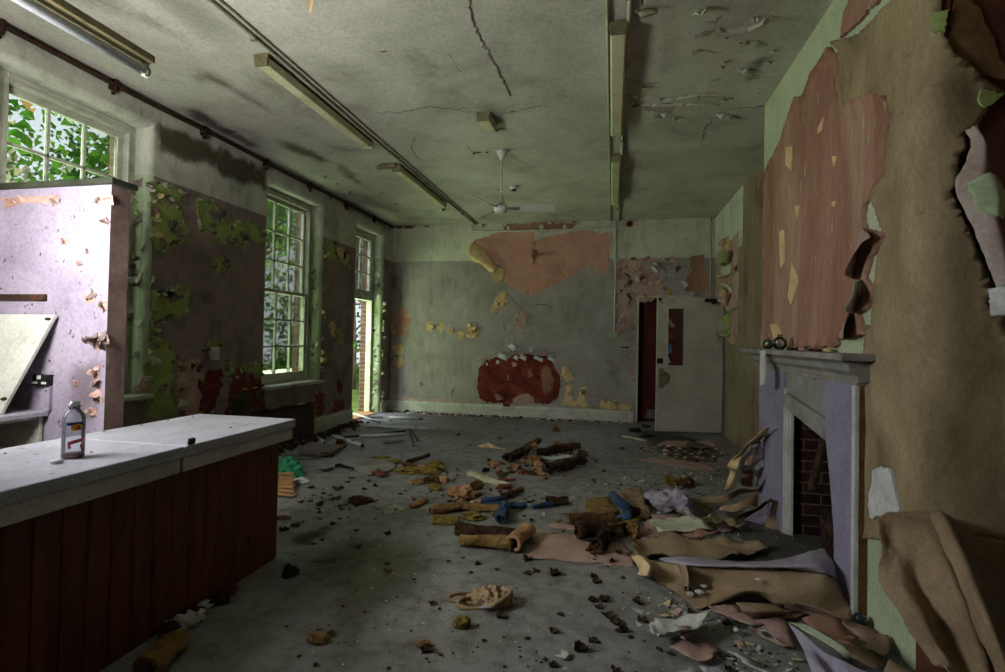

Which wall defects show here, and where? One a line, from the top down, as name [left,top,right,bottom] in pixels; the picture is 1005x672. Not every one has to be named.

peeling [930,10,949,33]
crack [468,0,551,113]
leakage [158,124,266,190]
leakage [192,110,253,147]
crack [376,106,477,162]
peeling [977,88,1004,108]
peeling [126,176,268,419]
peeling [468,221,696,381]
flaking render [370,258,631,411]
flaking render [868,466,902,520]